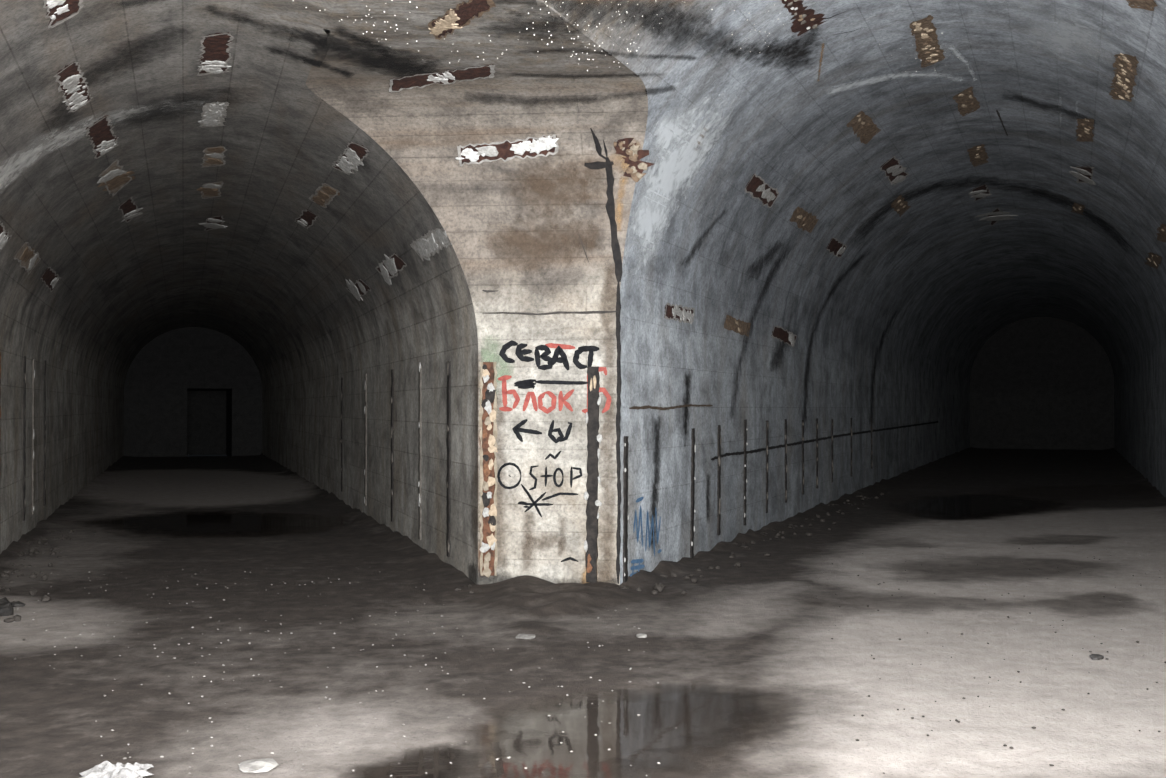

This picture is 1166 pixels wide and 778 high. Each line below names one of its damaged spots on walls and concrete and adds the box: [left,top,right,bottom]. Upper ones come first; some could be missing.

spalling [43,0,84,29]
spalling [428,0,496,40]
spalling [782,0,828,36]
spalling [1126,0,1158,11]
spalling [196,32,234,76]
spalling [910,15,945,67]
spalling [53,62,93,113]
spalling [389,64,495,92]
spalling [456,134,559,166]